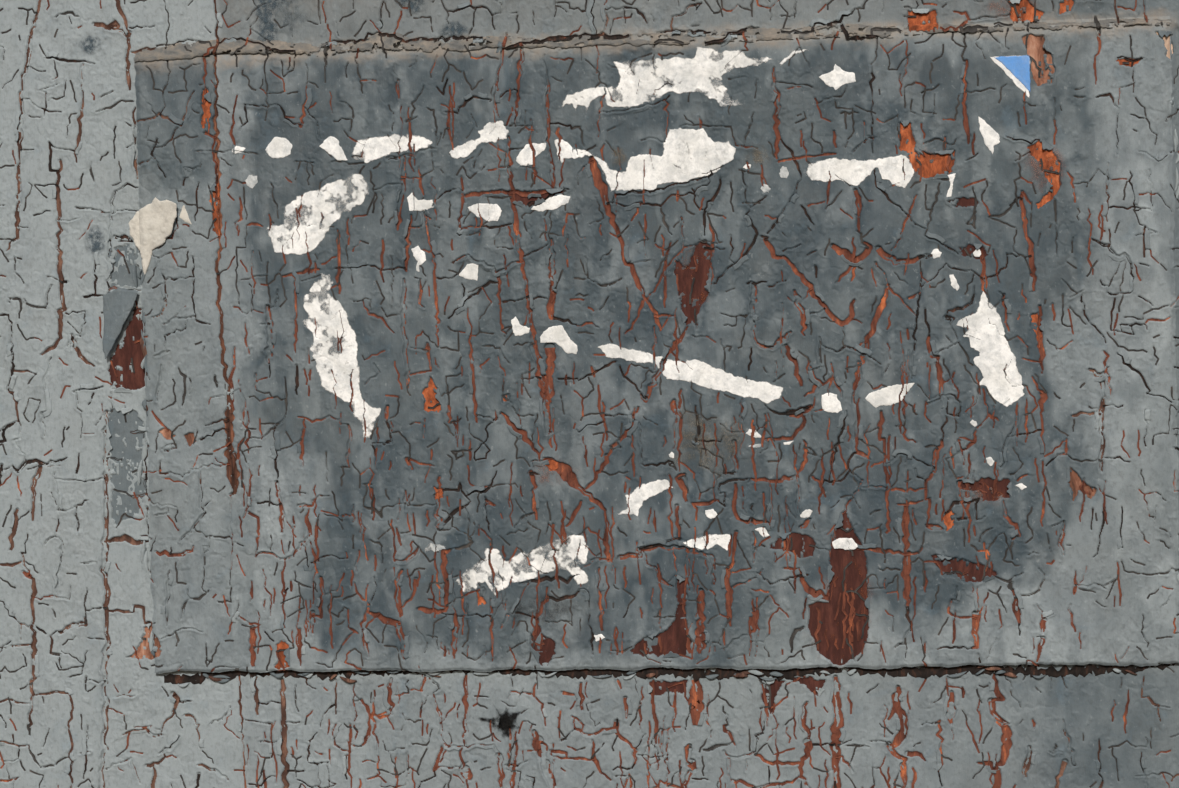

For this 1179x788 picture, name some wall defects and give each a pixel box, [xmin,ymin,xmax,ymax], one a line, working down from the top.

peeling [1009,0,1055,86]
crack [1074,0,1179,175]
peeling [898,120,955,179]
peeling [1027,139,1060,209]
crack [0,0,114,455]
crack [80,234,140,298]
peeling [674,242,711,326]
peeling [102,197,196,525]
crack [151,368,192,453]
crack [1079,480,1123,558]
peeling [808,510,870,665]
crack [1073,559,1179,607]